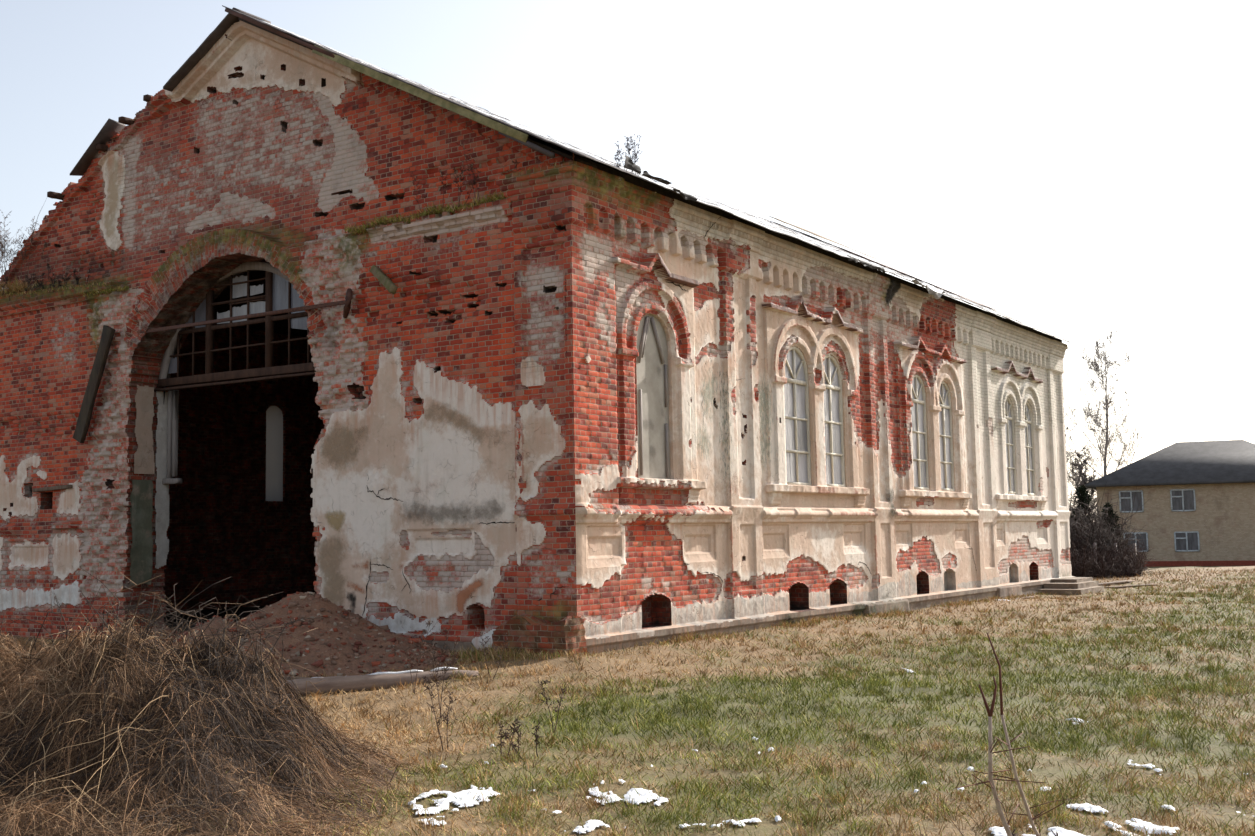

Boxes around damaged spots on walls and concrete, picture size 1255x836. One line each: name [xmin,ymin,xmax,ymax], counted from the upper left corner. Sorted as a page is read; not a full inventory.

spalling [0,288,169,612]
peeling [74,151,127,251]
peeling [179,22,1071,639]